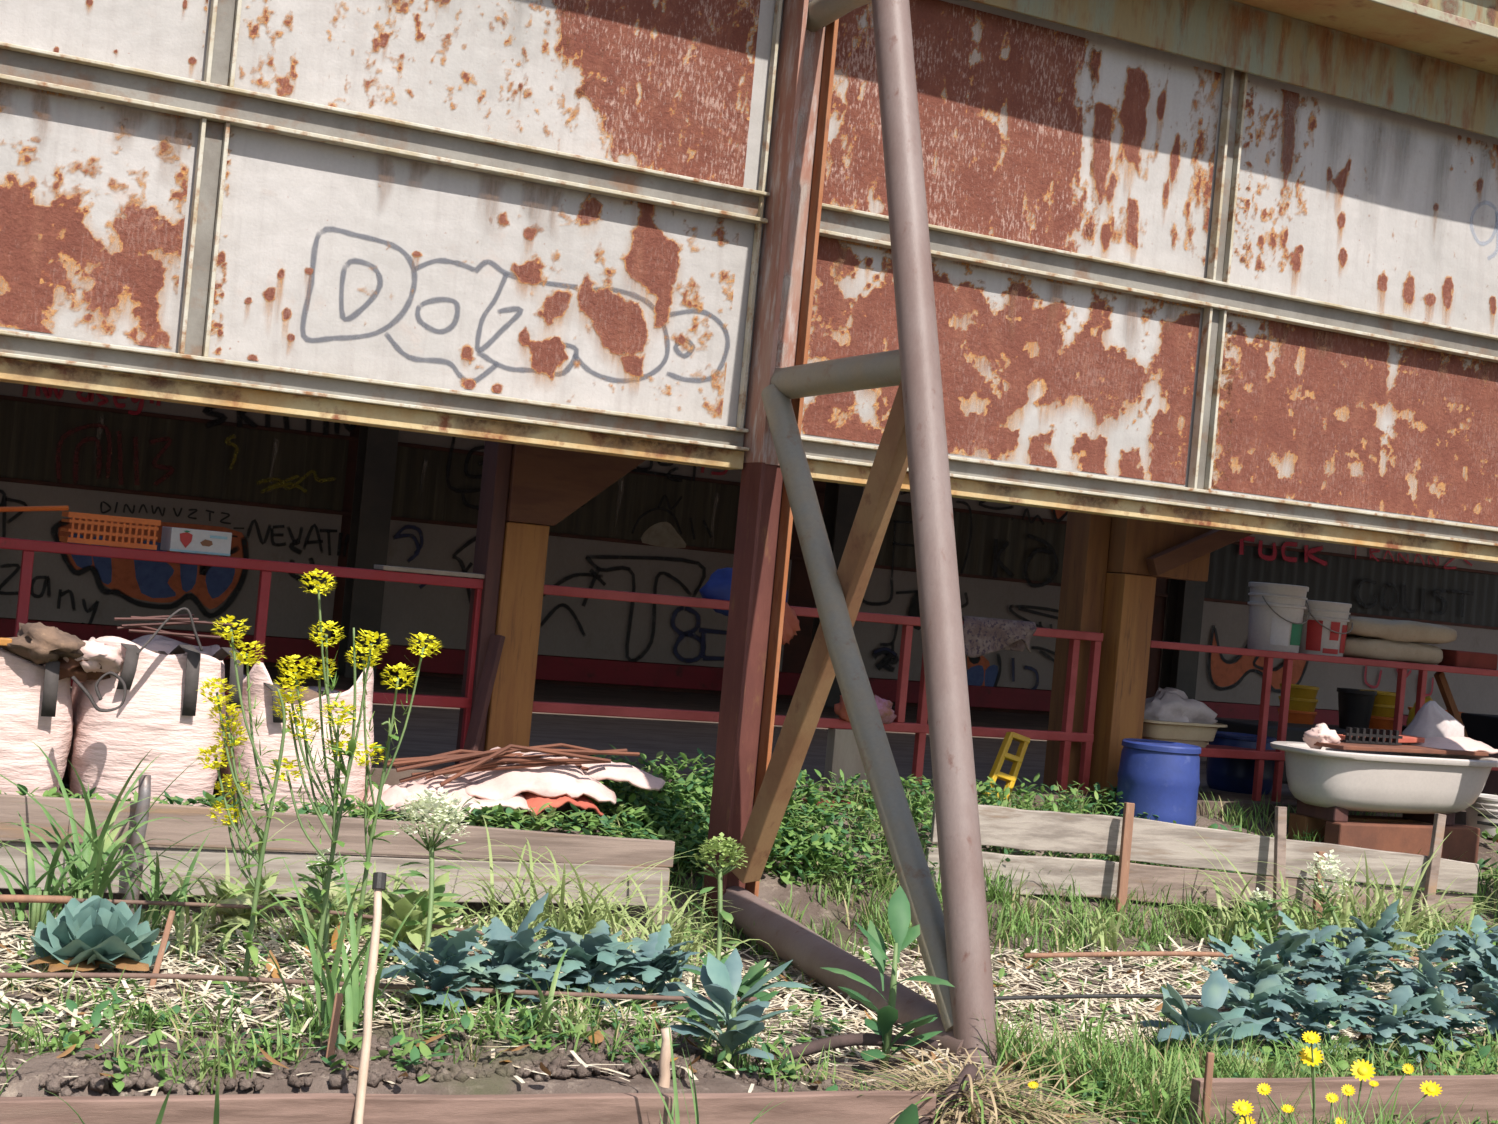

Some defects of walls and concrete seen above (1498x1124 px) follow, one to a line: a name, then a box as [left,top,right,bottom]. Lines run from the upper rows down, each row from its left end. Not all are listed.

rust [0,113,191,349]
rust [329,0,466,107]
rust [445,0,760,187]
rust [498,201,735,417]
rust [802,386,899,444]
rust [808,236,899,361]
rust [822,2,888,216]
rust [909,0,1222,253]
rust [932,263,1200,485]
rust [1234,88,1320,274]
rust [1211,314,1498,527]
rust [1377,271,1454,311]